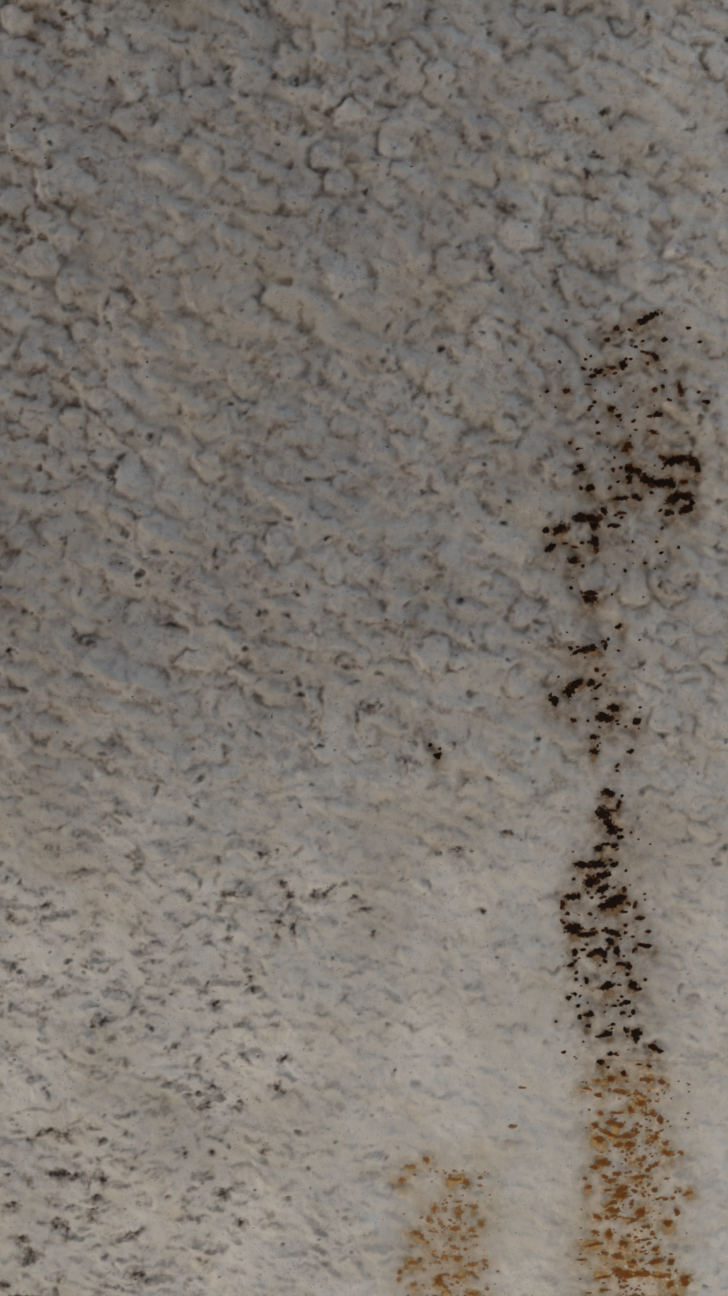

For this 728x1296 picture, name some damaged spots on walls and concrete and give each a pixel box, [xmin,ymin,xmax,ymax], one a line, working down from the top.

corrosion [542,310,710,614]
corrosion [548,623,642,763]
corrosion [560,788,693,1296]
corrosion [397,1157,499,1296]